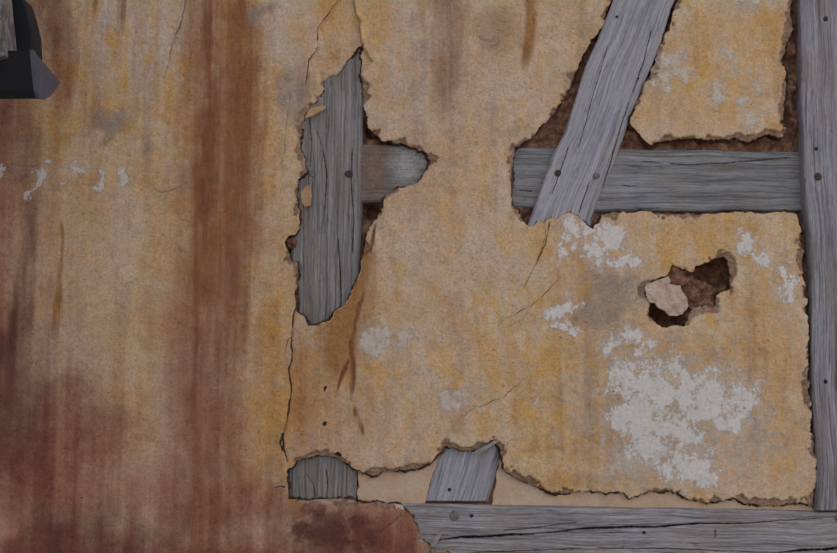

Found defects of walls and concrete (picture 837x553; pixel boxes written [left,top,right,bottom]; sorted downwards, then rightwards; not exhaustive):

water stain [0,159,52,200]
spalling [285,43,431,326]
spalling [510,0,613,226]
peeling [557,208,798,272]
peeling [627,0,795,148]
peeling [733,227,809,303]
crack [273,280,297,494]
peeling [287,256,814,552]
water stain [293,507,377,546]